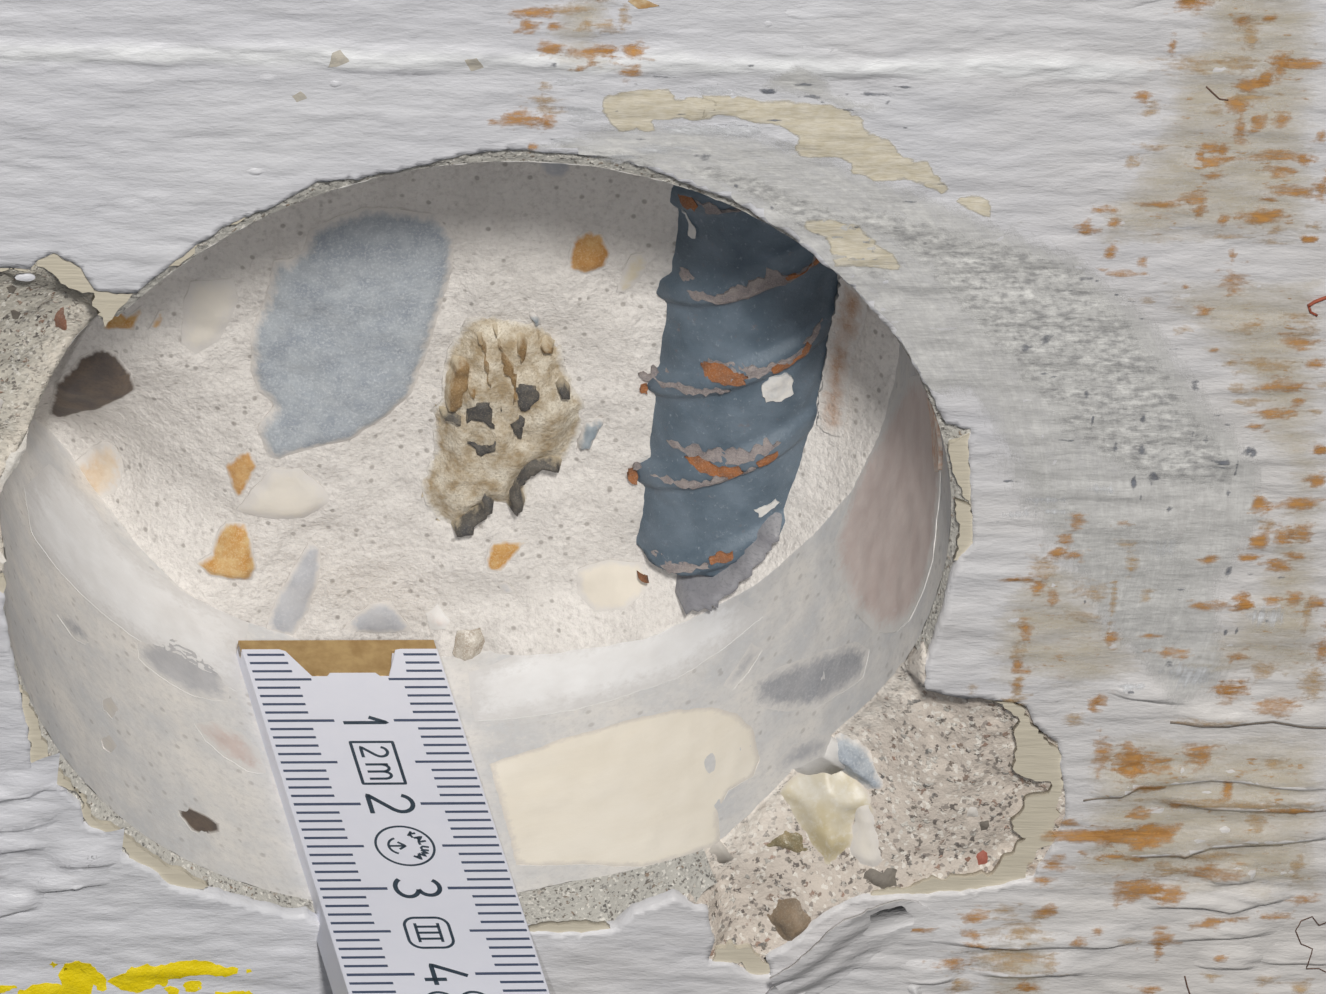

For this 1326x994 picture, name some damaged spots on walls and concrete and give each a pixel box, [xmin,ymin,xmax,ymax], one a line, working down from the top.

rust [577,45,642,76]
rust [1147,8,1326,238]
spalling [0,150,800,493]
rust [700,361,748,386]
rust [684,451,778,479]
rust [1240,497,1309,571]
spalling [517,328,1065,994]
crack [1170,721,1326,729]
spalling [10,642,315,913]
crack [1083,786,1165,802]
rust [1048,743,1310,903]
crack [1140,844,1283,858]